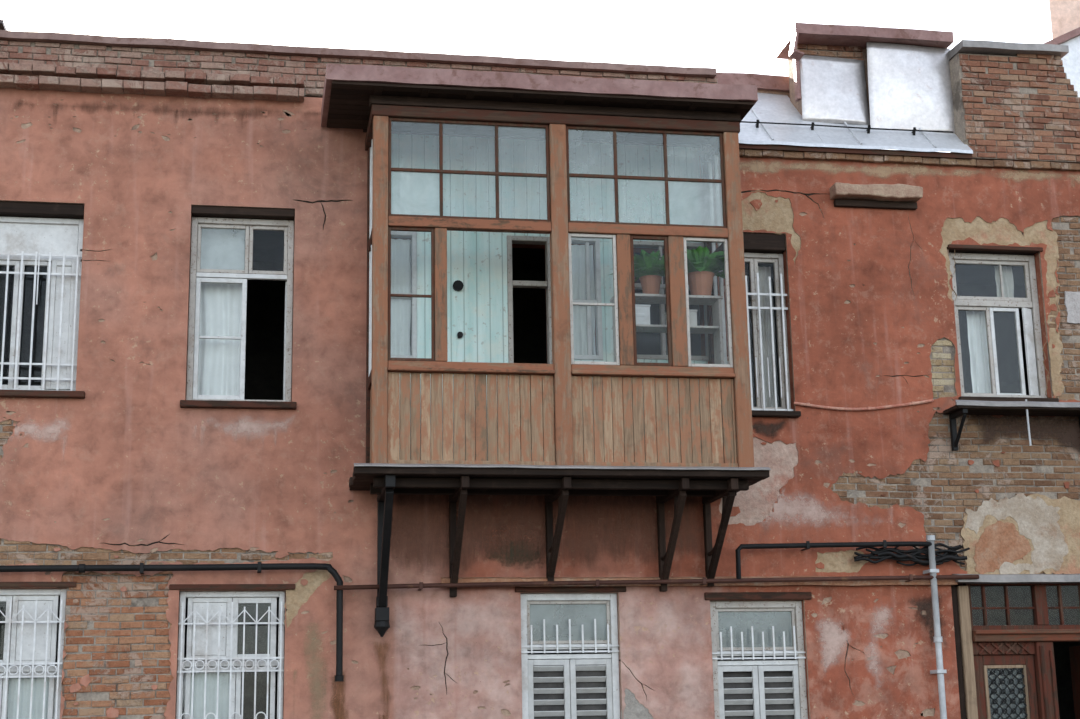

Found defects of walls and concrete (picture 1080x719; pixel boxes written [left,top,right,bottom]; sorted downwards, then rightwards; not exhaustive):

crack [296,200,351,229]
flaking render [742,190,806,263]
flaking render [939,216,1080,401]
spalling [0,411,29,461]
flaking render [719,437,798,526]
spalling [823,338,1080,584]
flaking render [815,550,868,573]
spalling [0,538,352,719]
crack [426,626,455,694]